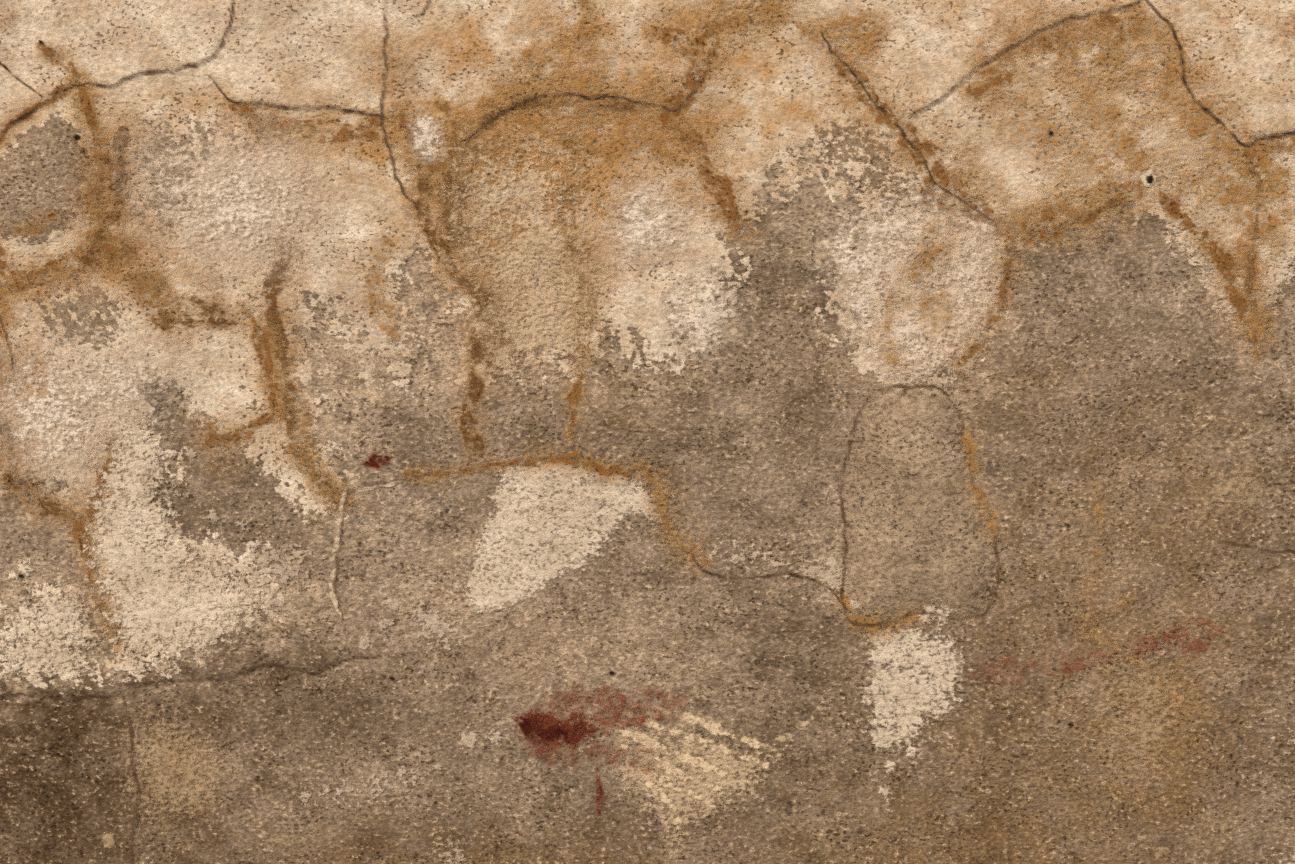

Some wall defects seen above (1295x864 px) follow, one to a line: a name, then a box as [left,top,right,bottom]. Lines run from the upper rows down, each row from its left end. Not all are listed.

crack [0,4,419,210]
crack [468,73,706,140]
crack [821,32,992,220]
crack [982,0,1295,147]
damp [364,454,390,469]
crack [695,561,846,608]
crack [1212,542,1295,555]
crack [82,472,432,862]